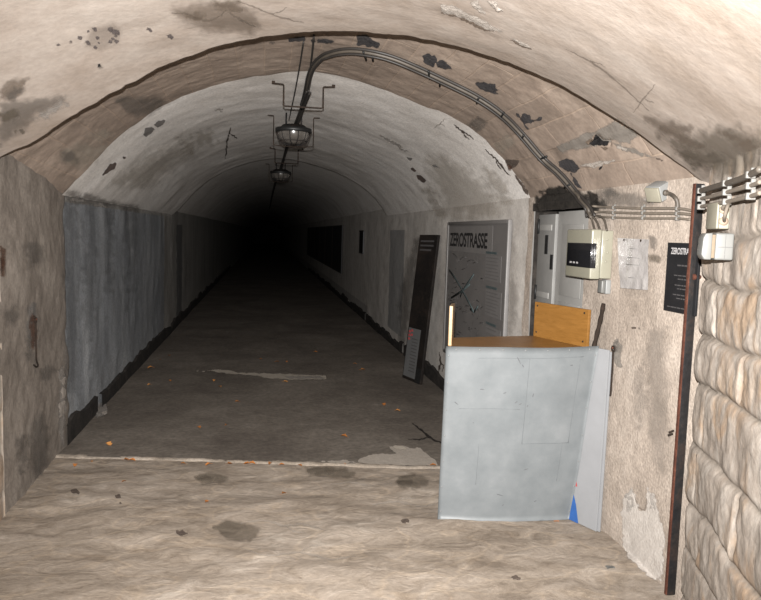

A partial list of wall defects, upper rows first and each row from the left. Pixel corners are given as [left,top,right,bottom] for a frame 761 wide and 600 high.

spalling [440,1,503,32]
peeling [143,120,165,137]
spalling [586,135,609,150]
damp [673,131,757,174]
crack [408,423,441,443]
spalling [321,445,438,466]
spalling [620,487,665,581]